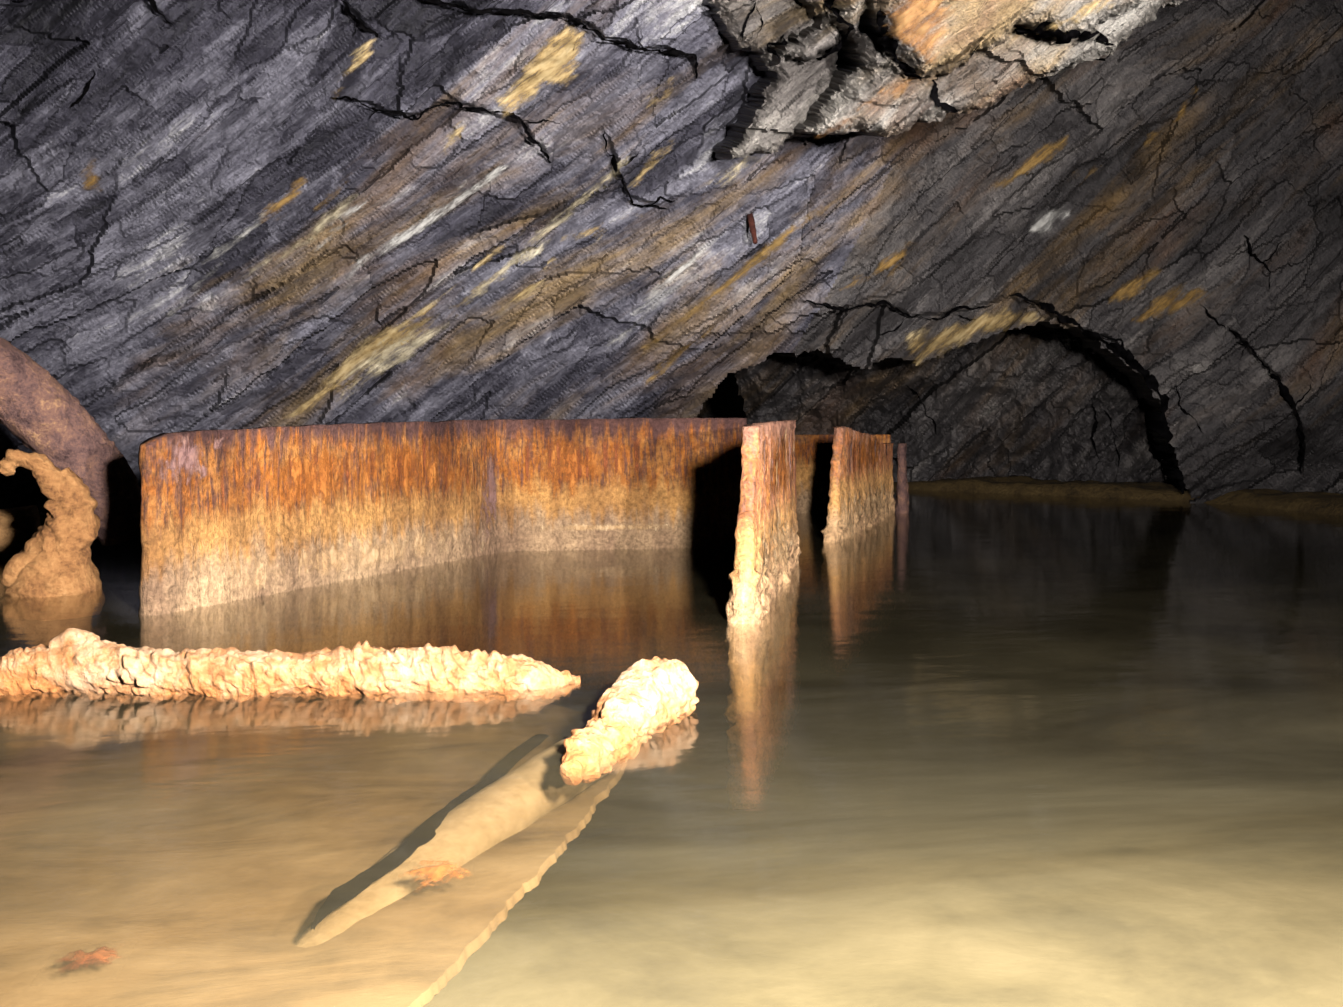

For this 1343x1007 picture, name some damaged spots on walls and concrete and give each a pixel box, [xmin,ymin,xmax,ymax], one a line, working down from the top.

crack [149,0,176,30]
crack [341,0,382,40]
crack [426,0,699,79]
crack [729,0,981,113]
crack [331,96,560,163]
crack [800,293,1202,494]
corrosion [221,439,497,536]
corrosion [525,440,640,495]
corrosion [764,428,794,505]